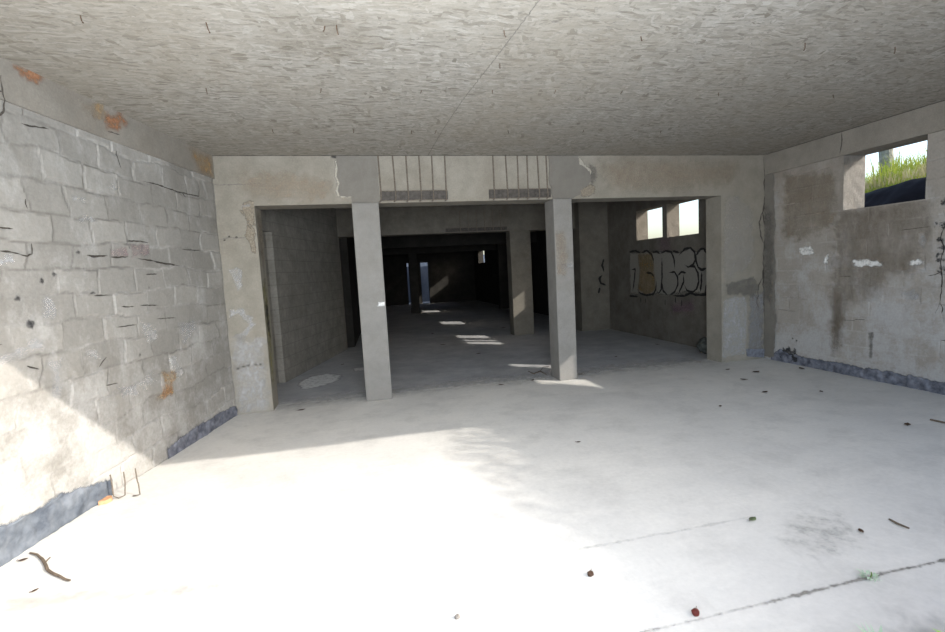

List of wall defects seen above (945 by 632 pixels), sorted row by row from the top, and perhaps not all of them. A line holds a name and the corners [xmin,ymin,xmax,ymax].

crack [0,76,47,129]
crack [316,0,590,156]
crack [87,181,264,400]
spalling [240,200,256,253]
crack [756,100,945,316]